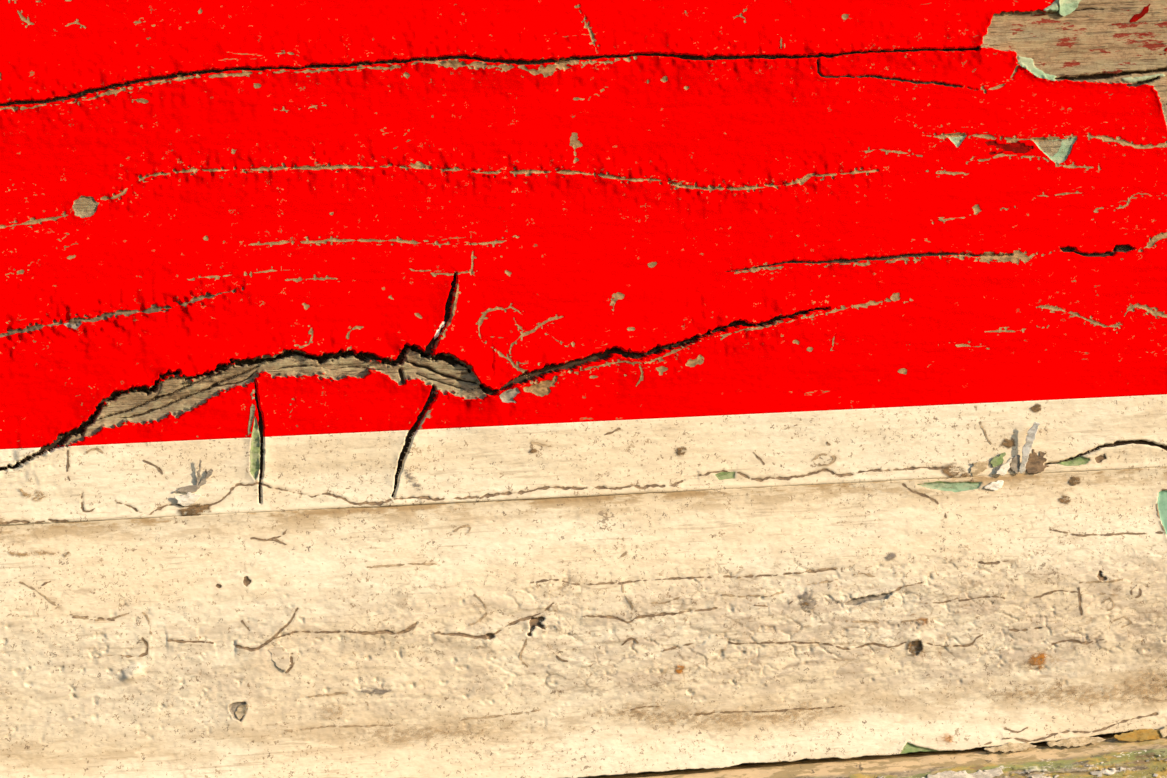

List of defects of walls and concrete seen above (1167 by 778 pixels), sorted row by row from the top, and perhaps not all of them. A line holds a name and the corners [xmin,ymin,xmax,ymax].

crack [0,4,1018,114]
peeling [981,0,1167,125]
spalling [570,132,583,163]
peeling [865,147,923,157]
peeling [922,132,1167,178]
crack [725,229,1167,274]
crack [0,275,947,535]
crack [1044,440,1167,465]
peeling [1156,489,1167,535]
crack [250,529,287,545]
peeling [578,726,1167,778]